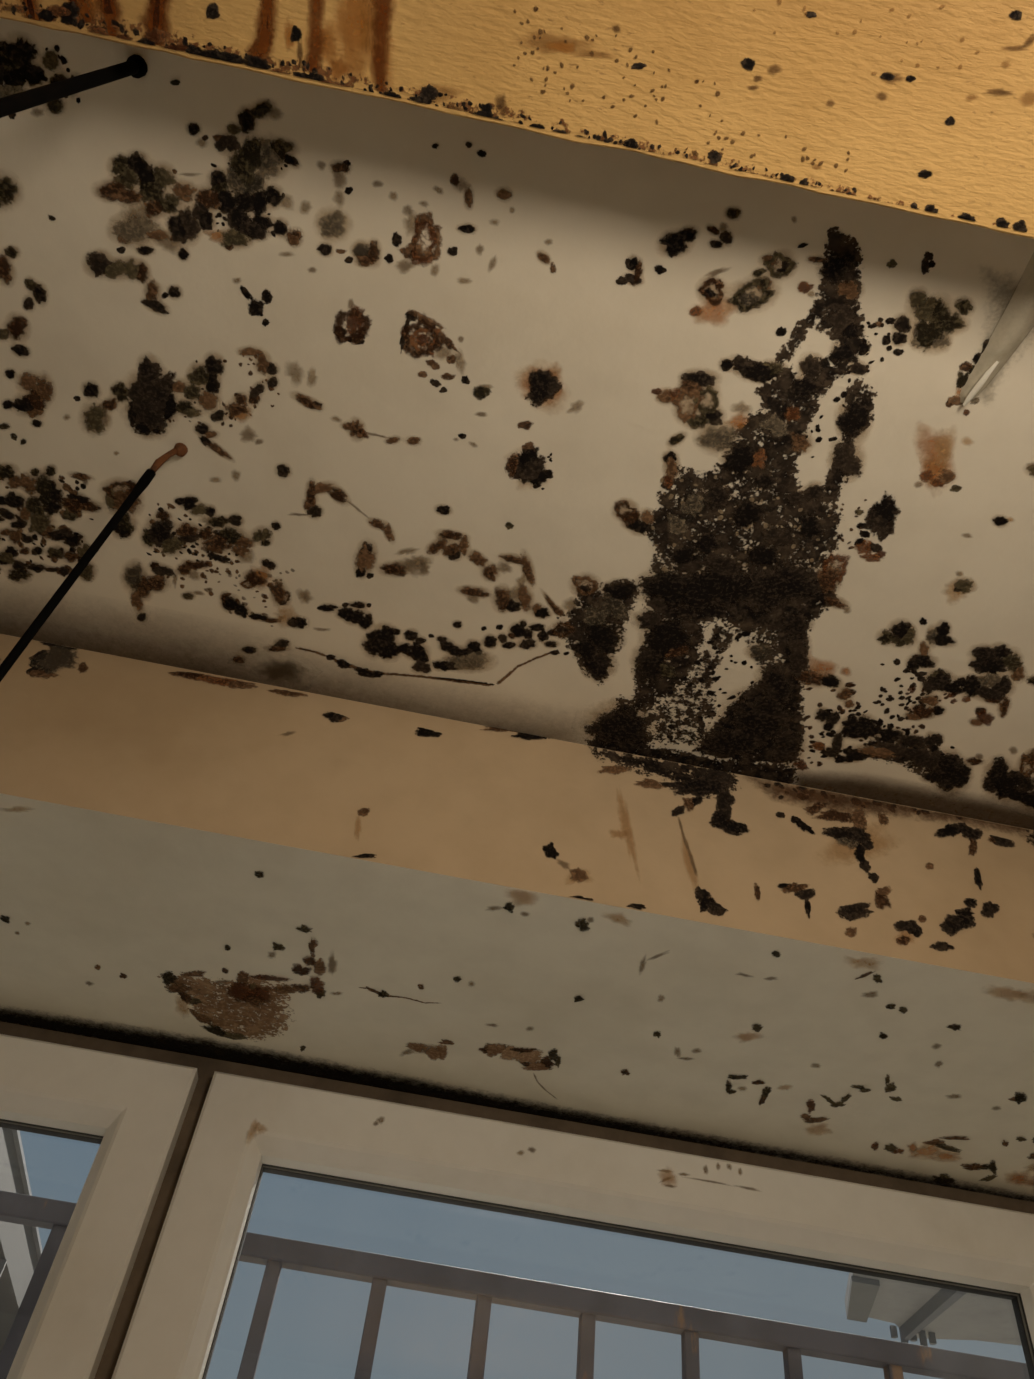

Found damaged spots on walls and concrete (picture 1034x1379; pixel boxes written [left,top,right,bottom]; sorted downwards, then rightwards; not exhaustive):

water stain [0,38,81,116]
corrosion [0,0,570,133]
water stain [741,58,780,90]
water stain [877,72,916,100]
water stain [565,104,976,221]
water stain [86,101,495,314]
water stain [616,208,741,285]
water stain [993,217,1027,232]
water stain [0,226,1034,951]
peeling [157,924,340,1042]
peeling [403,1039,454,1060]
peeling [479,1043,561,1098]